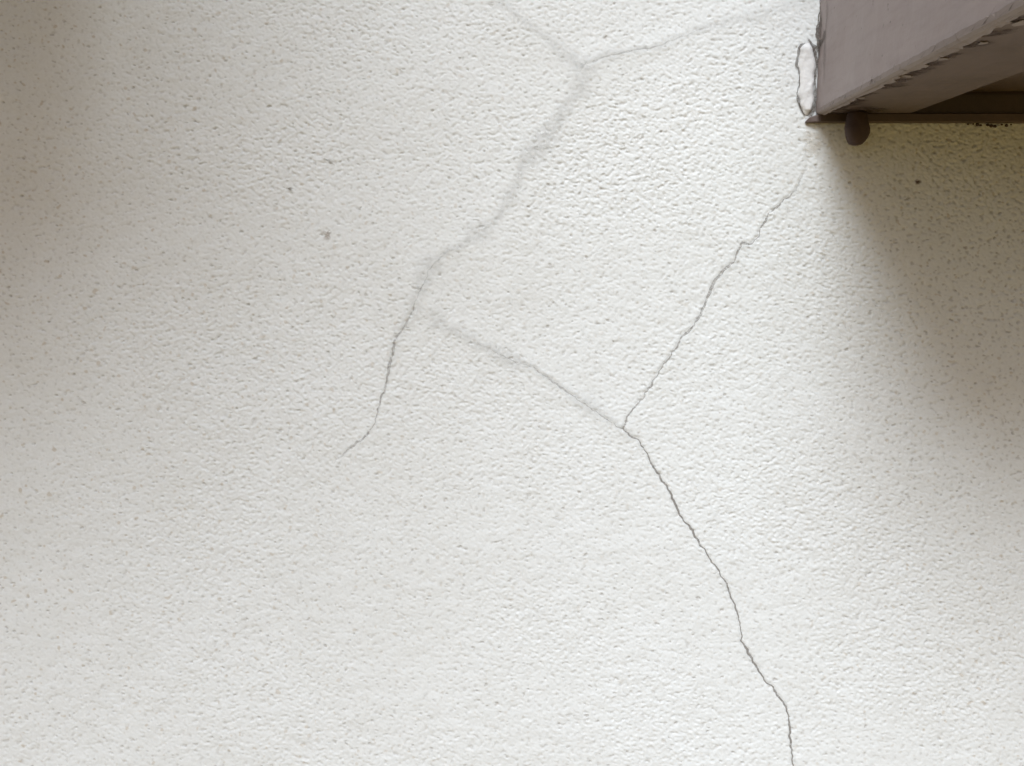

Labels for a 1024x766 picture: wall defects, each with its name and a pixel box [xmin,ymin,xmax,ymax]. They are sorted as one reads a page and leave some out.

crack [606,198,794,766]